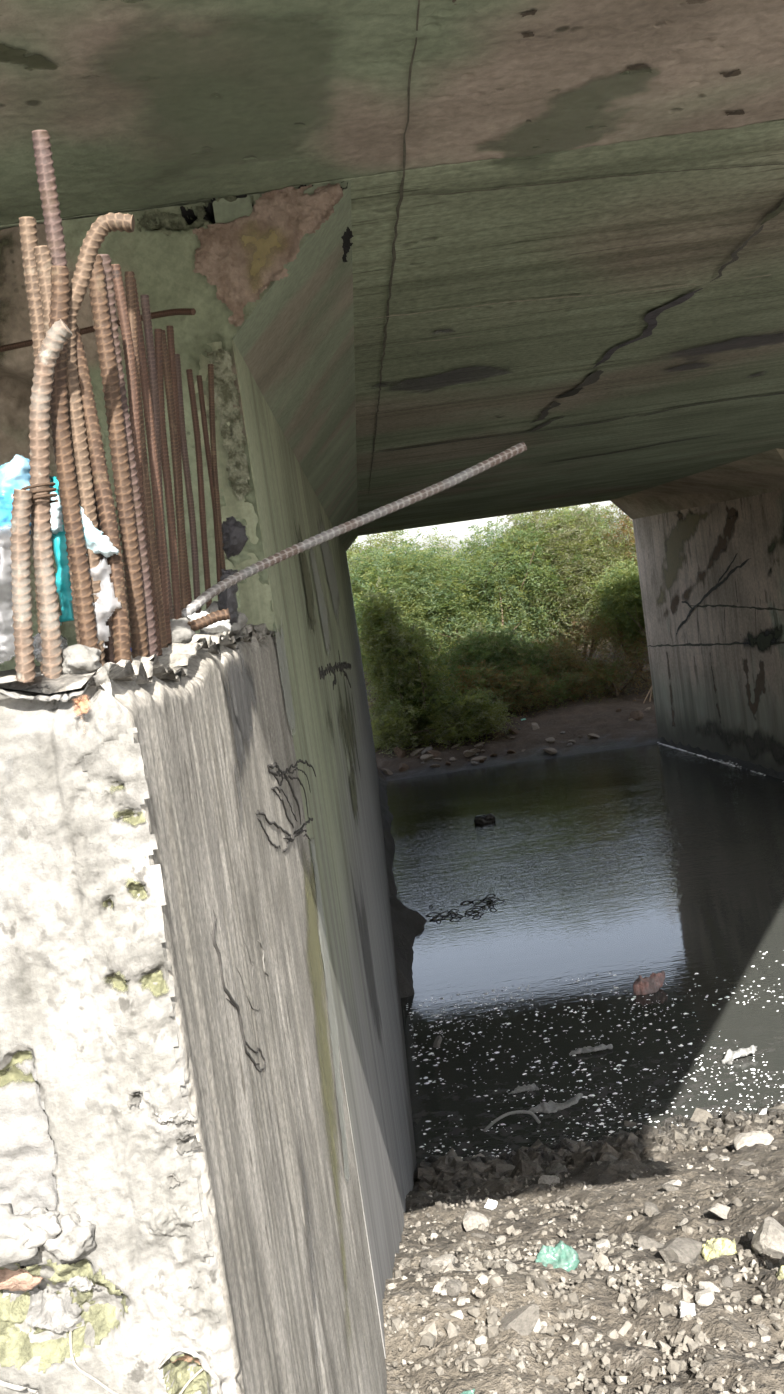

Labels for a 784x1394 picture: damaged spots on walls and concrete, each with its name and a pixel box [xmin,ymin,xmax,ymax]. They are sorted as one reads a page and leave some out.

leakage [104,20,332,173]
leakage [481,71,657,166]
crack [368,201,784,464]
spalling [0,130,527,683]
crack [675,553,751,642]
crack [256,759,316,852]
crack [211,910,269,1072]
spalling [0,1259,128,1373]
spalling [158,1347,222,1394]